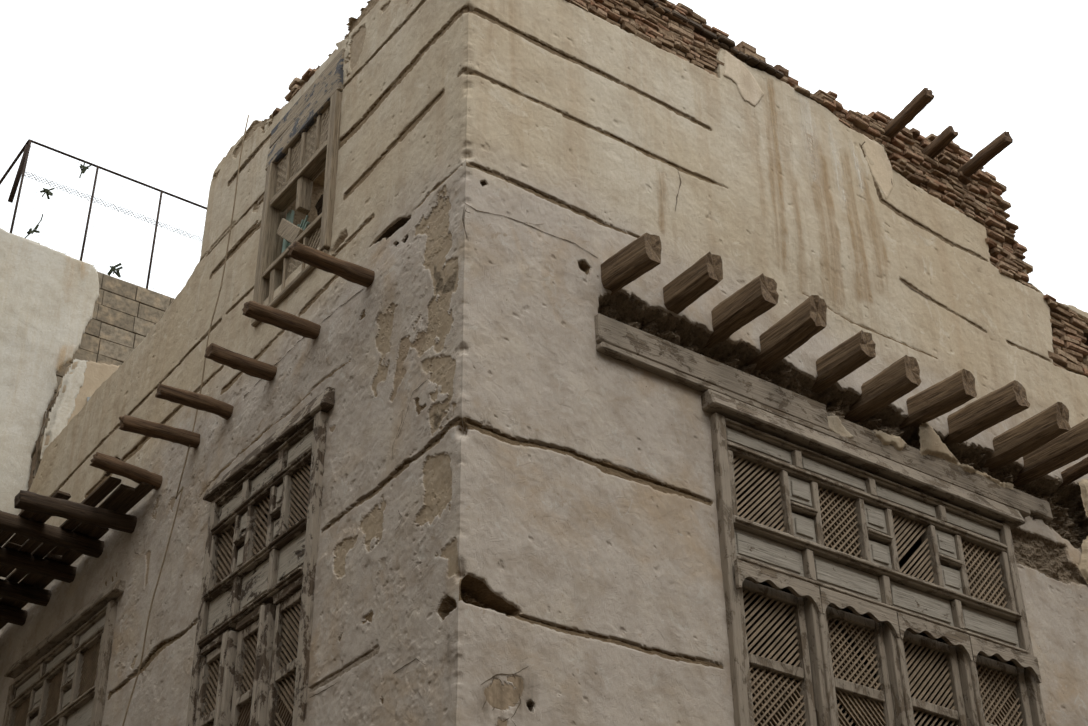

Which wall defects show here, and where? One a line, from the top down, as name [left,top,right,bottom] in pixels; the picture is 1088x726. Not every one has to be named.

peeling [360,186,459,436]
spalling [598,291,1088,585]
peeling [416,453,452,527]
peeling [334,497,386,578]
peeling [436,538,460,578]
spalling [438,596,457,620]
peeling [484,676,524,726]